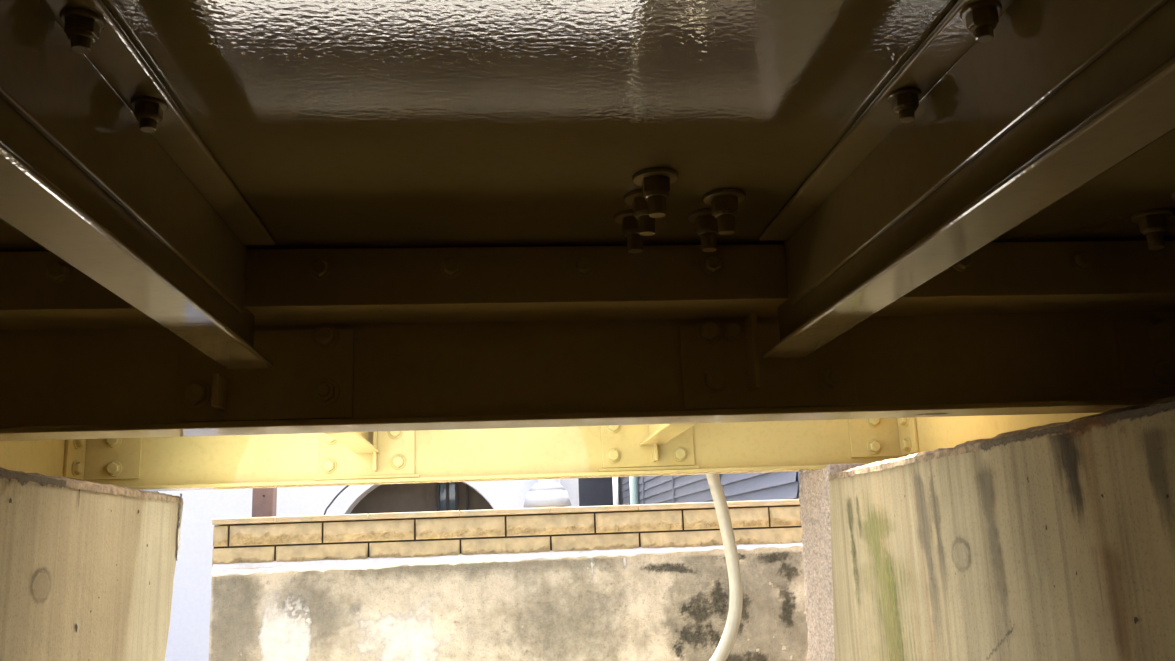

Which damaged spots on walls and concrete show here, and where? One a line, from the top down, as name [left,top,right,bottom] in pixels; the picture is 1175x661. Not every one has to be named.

leakage [1052,432,1080,512]
leakage [917,479,943,595]
leakage [644,552,808,661]